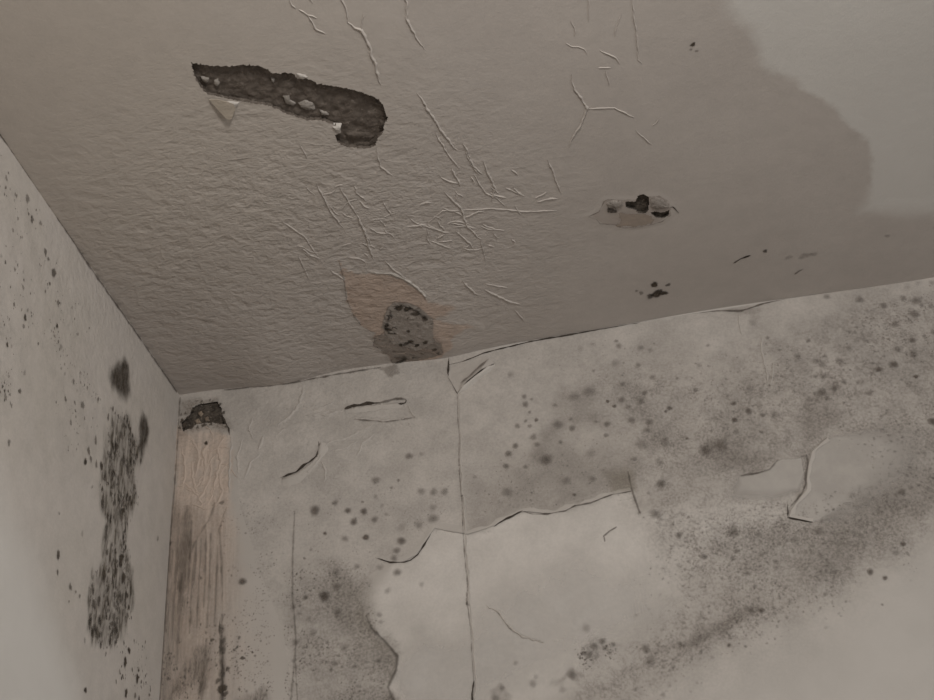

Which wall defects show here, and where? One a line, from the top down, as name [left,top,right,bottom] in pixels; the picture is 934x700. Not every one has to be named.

spalling [191,62,387,146]
crack [283,93,561,281]
damp [0,0,934,395]
crack [566,0,659,147]
peeling [581,192,678,230]
peeling [333,256,485,376]
crack [670,296,802,318]
damp [0,136,179,700]
spalling [179,403,230,435]
crack [447,281,646,700]
damp [178,277,934,700]
peeling [352,433,903,700]